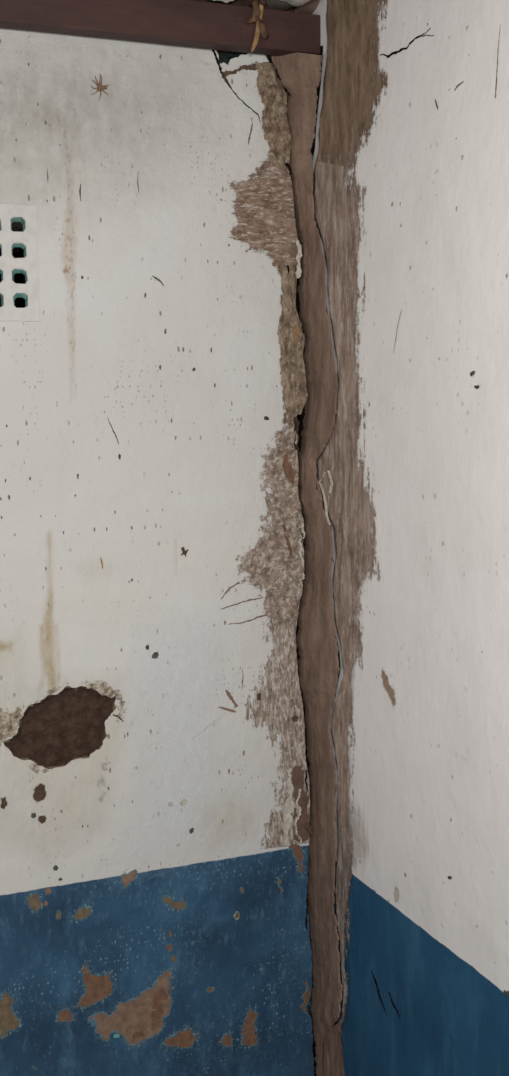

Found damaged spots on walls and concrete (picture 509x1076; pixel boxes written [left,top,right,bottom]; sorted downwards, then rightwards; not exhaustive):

crack [212,50,290,123]
crack [284,46,323,181]
crack [294,266,307,455]
peeling [216,50,312,881]
crack [296,484,305,574]
flaking render [313,0,388,1076]
spalling [0,680,125,824]
crack [296,601,334,793]
peeling [381,668,397,706]
peeling [24,865,93,923]
peeling [55,930,200,1051]
crack [305,894,317,1076]